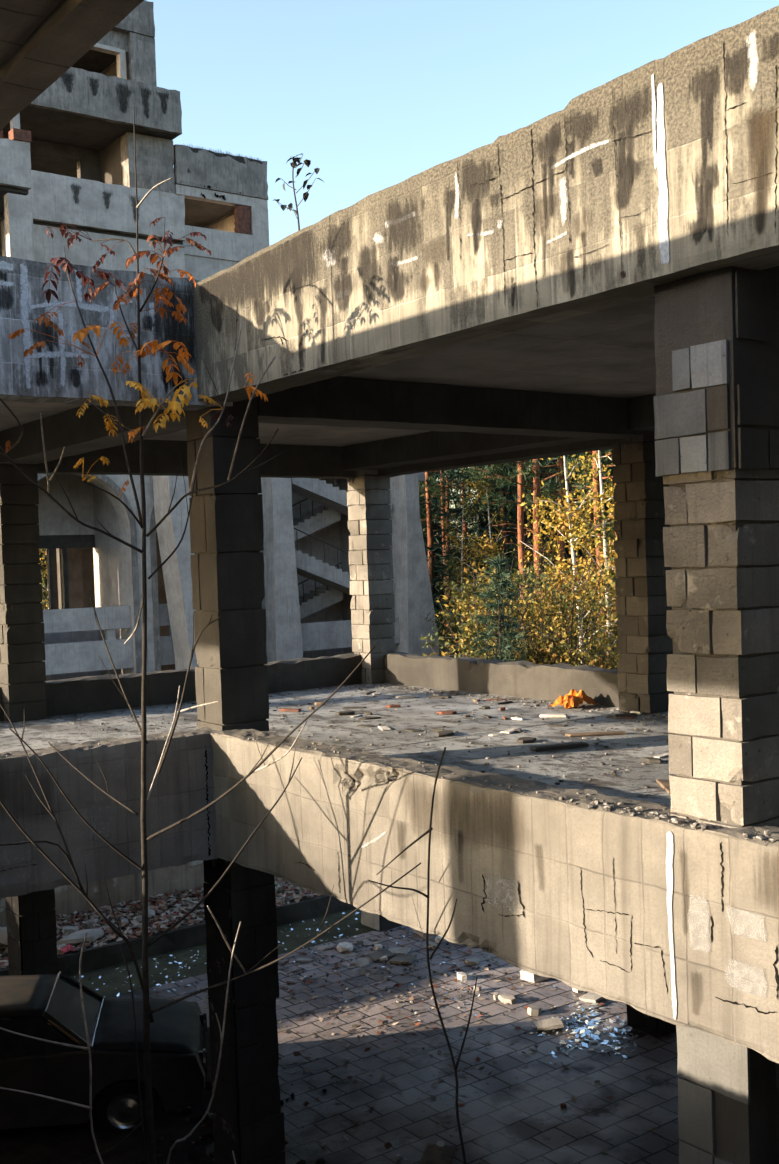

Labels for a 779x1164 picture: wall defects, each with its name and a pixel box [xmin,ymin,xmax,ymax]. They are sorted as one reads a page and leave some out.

leakage [61,72,73,92]
leakage [117,84,169,118]
leakage [443,158,501,260]
leakage [537,87,650,243]
leakage [689,33,777,244]
leakage [0,198,423,398]
leakage [567,250,575,297]
spalling [341,770,400,792]
crack [481,874,525,917]
crack [580,858,668,992]
crack [710,842,724,943]
crack [715,946,779,1014]